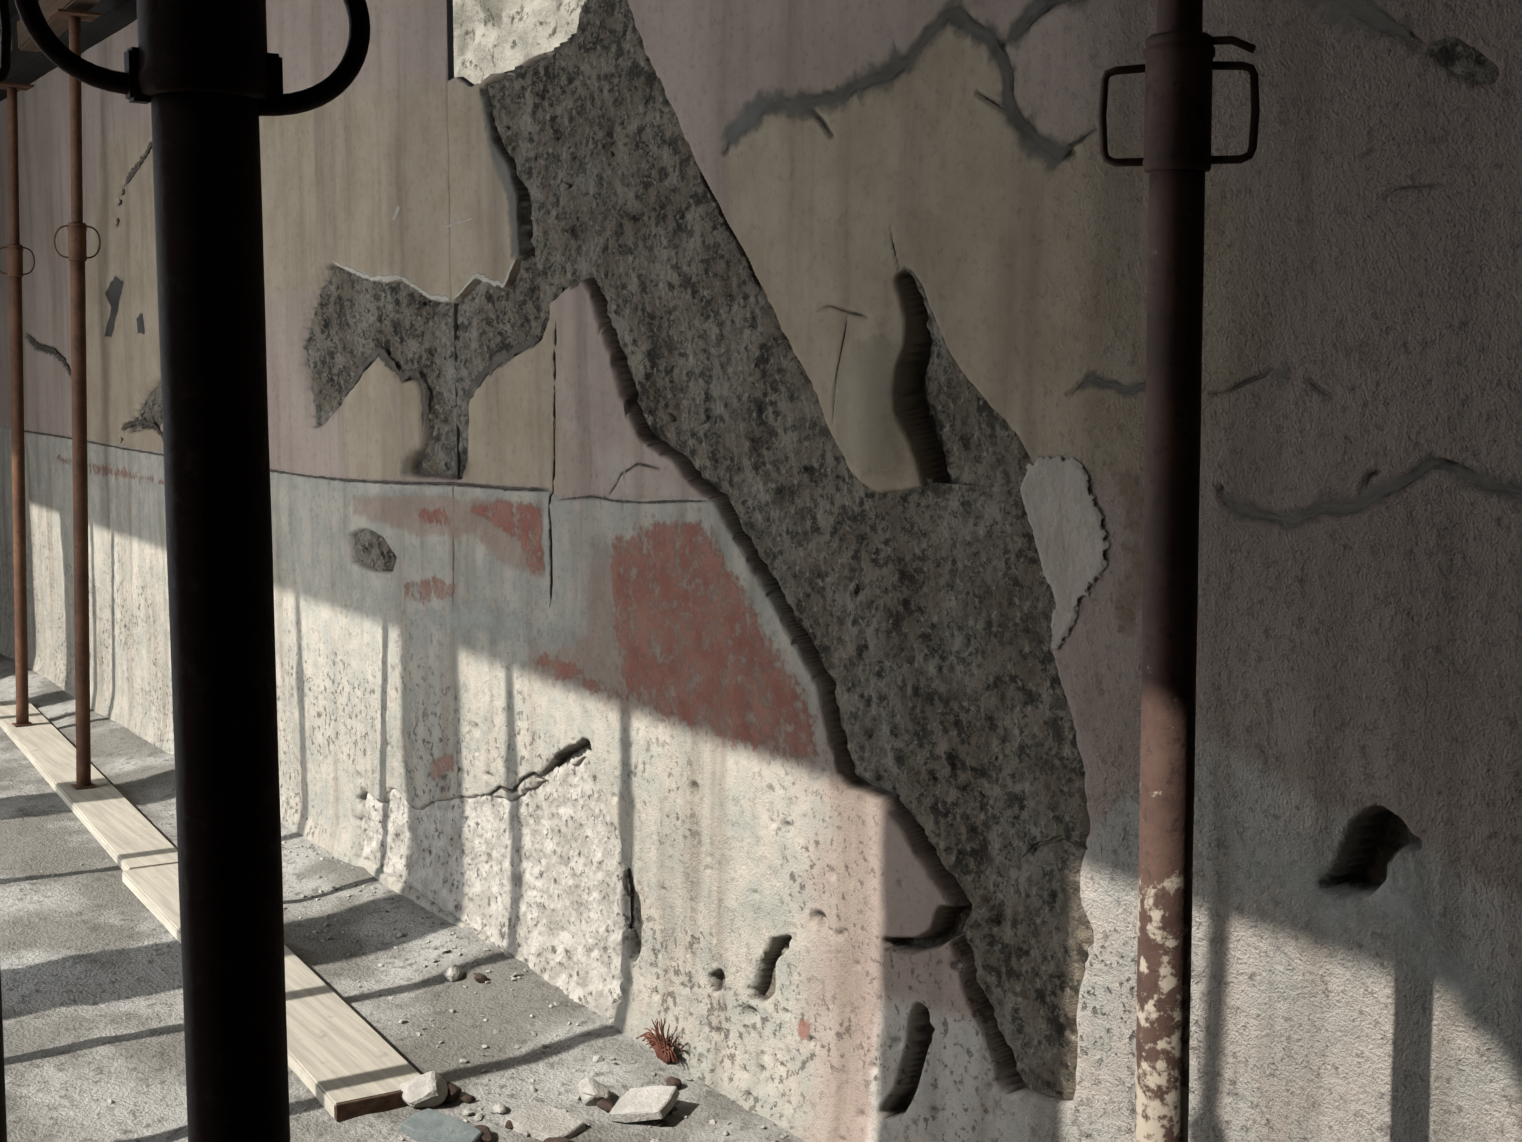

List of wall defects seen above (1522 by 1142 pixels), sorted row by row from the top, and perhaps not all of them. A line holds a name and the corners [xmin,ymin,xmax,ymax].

crack [700,0,1094,290]
spalling [133,380,163,431]
crack [1076,373,1146,397]
crack [1212,372,1268,395]
crack [1221,458,1522,528]
spalling [303,0,1094,1110]
crack [490,772,545,795]
spalling [1360,814,1421,886]